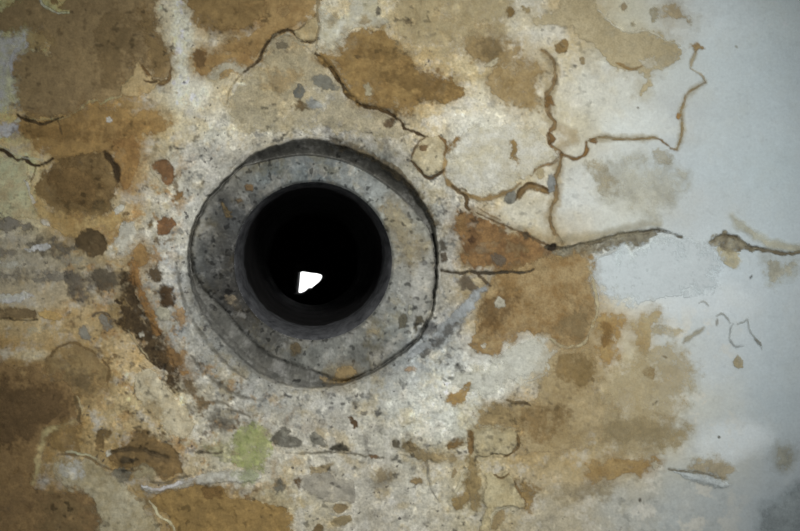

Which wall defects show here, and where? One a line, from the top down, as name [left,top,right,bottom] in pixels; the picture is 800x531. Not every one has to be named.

leakage [0,0,174,138]
crack [244,0,425,137]
leakage [316,0,682,96]
crack [452,43,704,257]
leakage [407,287,487,359]
crack [441,269,534,291]
leakage [452,337,557,395]
leakage [0,341,113,531]
leakage [475,403,518,429]